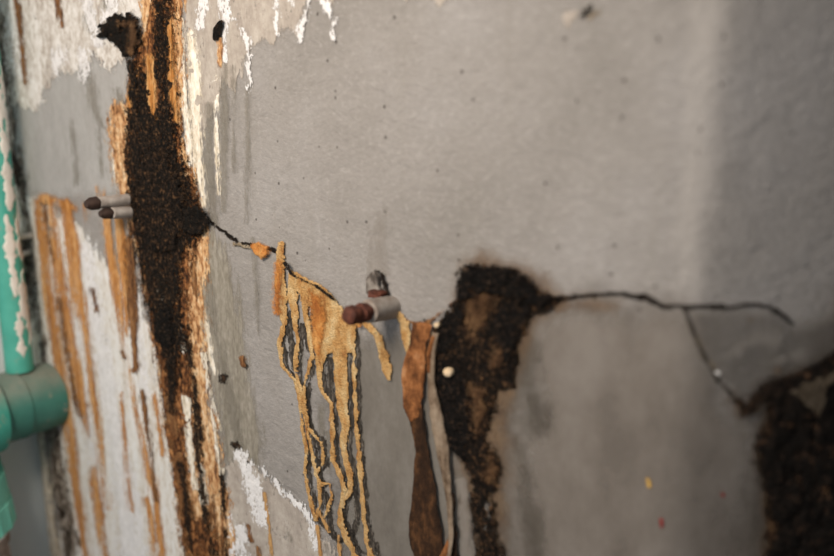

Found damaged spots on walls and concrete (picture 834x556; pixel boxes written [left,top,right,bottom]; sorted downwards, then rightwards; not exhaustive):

damp [11,152,25,190]
damp [186,29,222,207]
peeling [181,0,338,139]
peeling [562,4,601,29]
crack [209,220,335,300]
corrosion [34,193,111,556]
damp [322,262,834,556]
crack [551,291,795,404]
peeling [223,448,339,556]